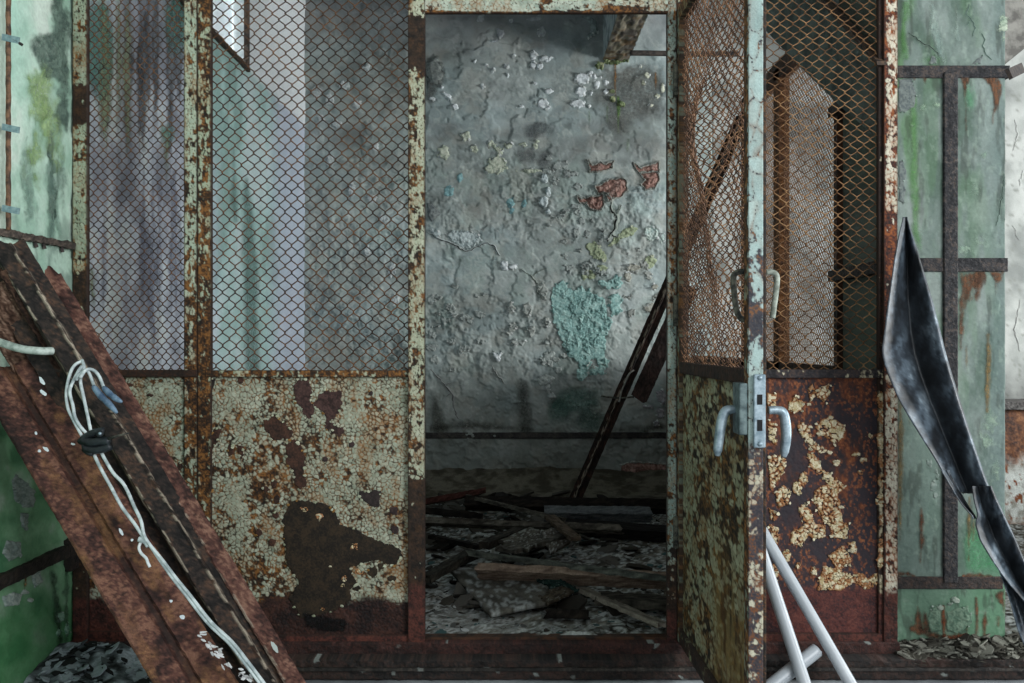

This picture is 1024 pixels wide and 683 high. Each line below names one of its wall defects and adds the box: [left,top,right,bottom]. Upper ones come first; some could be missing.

leakage [32,0,72,238]
peeling [530,50,554,111]
peeling [569,70,609,109]
corrosion [984,78,1002,112]
crack [427,231,500,256]
peeling [461,131,665,318]
crack [606,202,622,243]
crack [521,268,546,299]
corrosion [959,272,1003,341]
corrosion [212,427,244,460]
corrosion [293,378,355,448]
corrosion [254,412,403,618]